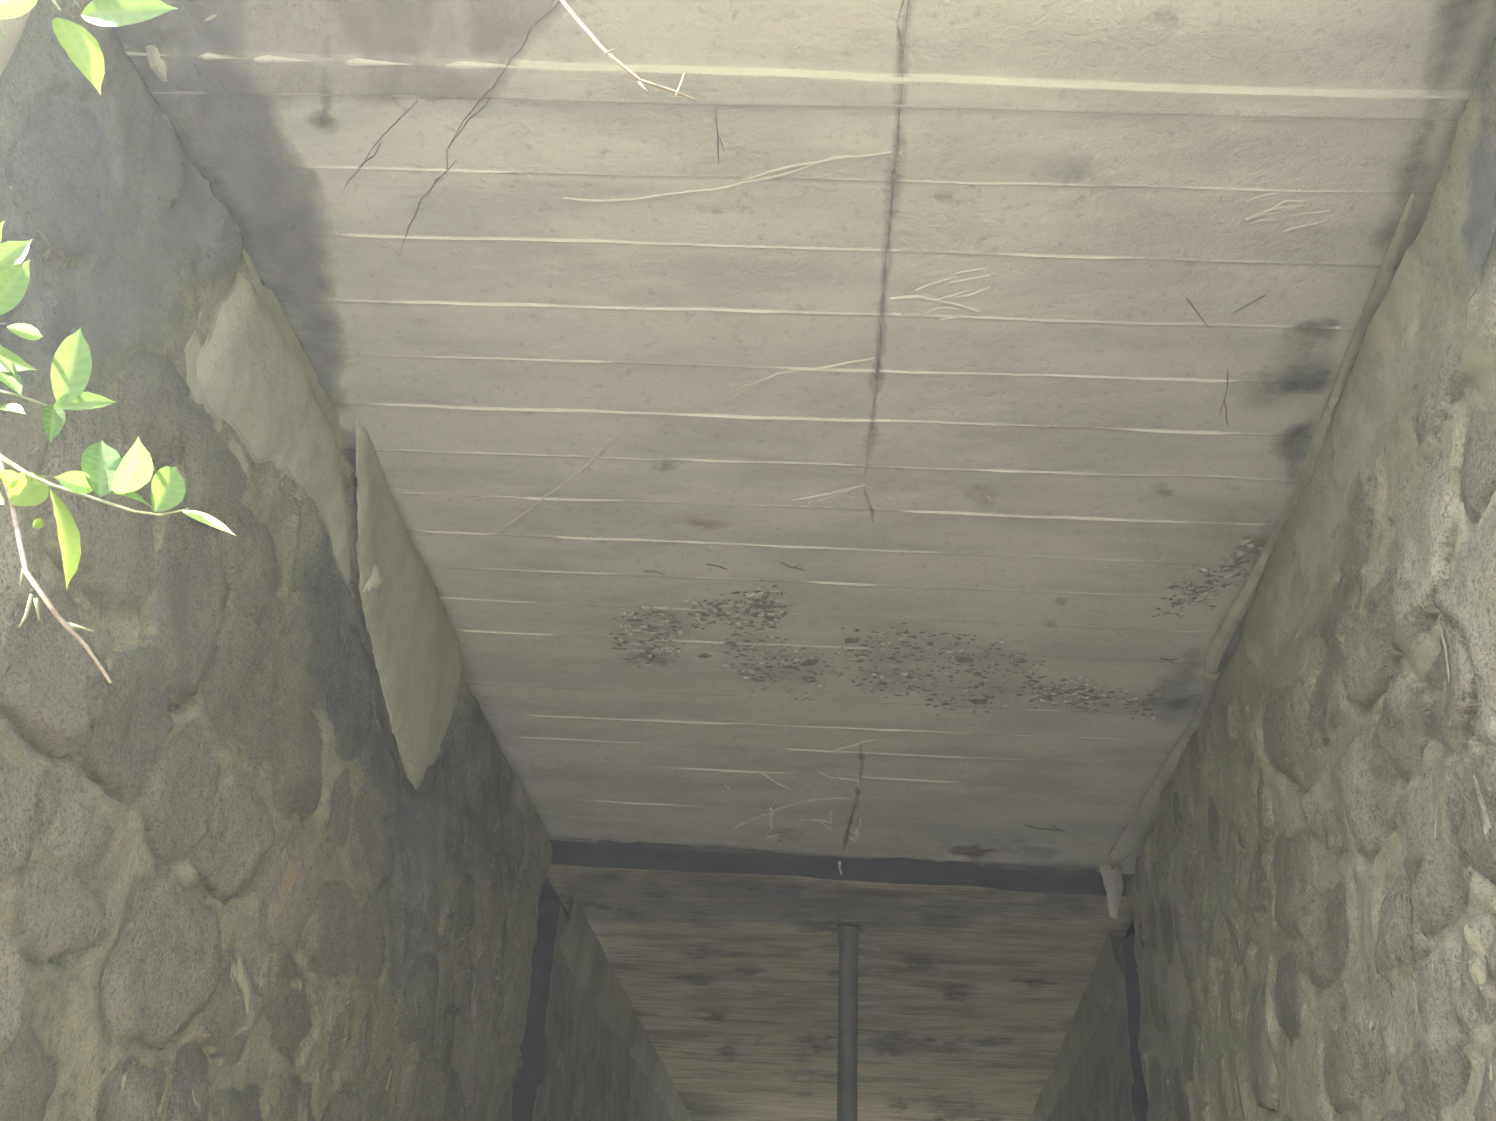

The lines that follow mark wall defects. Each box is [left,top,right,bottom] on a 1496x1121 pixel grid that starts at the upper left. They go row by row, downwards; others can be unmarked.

damp [0,0,322,374]
crack [342,99,419,193]
crack [398,1,560,257]
spalling [608,591,829,682]
spalling [845,627,991,716]